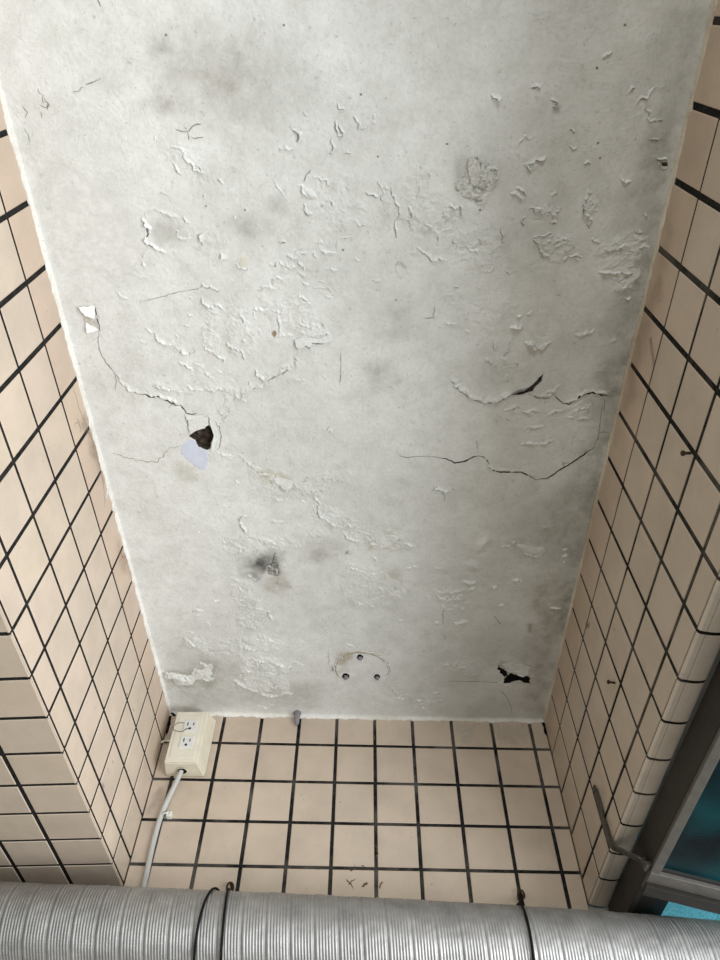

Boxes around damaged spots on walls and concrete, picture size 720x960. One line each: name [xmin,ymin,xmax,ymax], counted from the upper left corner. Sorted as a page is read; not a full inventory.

flaking render [455,156,501,204]
peeling [141,206,248,270]
peeling [78,305,100,333]
crack [73,387,178,499]
crack [98,336,196,415]
peeling [181,303,332,503]
crack [398,374,610,480]
water stain [257,552,286,584]
flaking render [161,661,217,687]
flaking render [497,660,536,686]